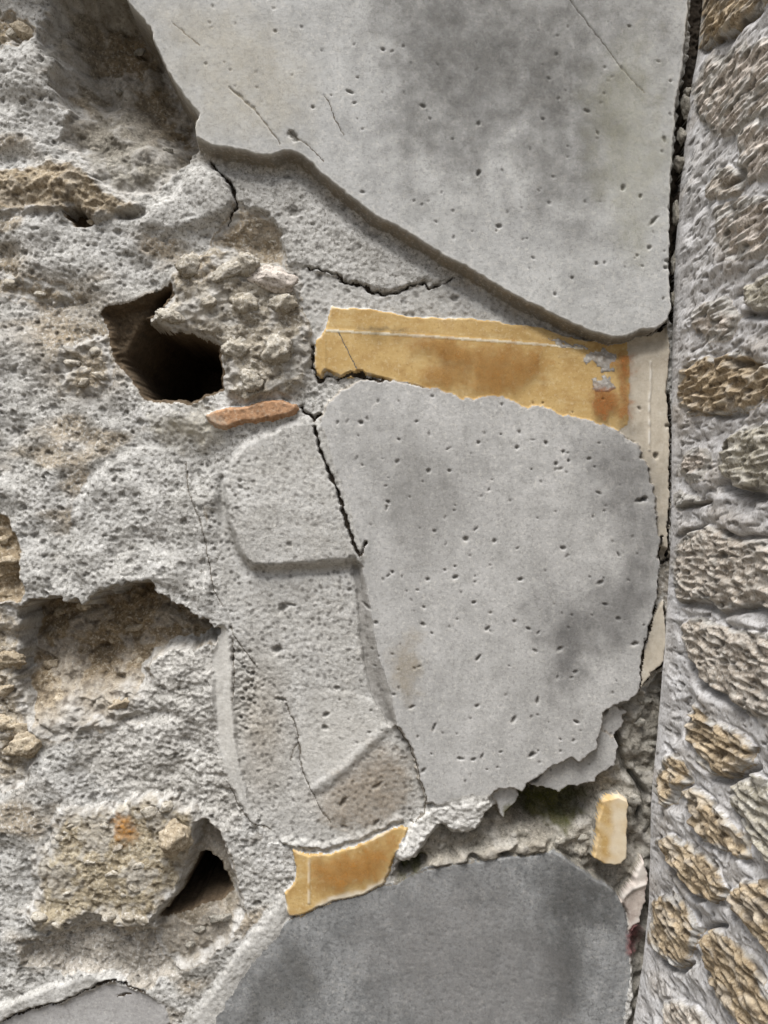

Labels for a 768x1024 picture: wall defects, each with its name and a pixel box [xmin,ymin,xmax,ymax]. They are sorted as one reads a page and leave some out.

crack [212,165,239,226]
crack [306,267,455,297]
crack [301,407,368,557]
spalling [0,514,221,793]
crack [285,700,331,823]
spalling [25,789,246,971]
spalling [391,671,662,1024]